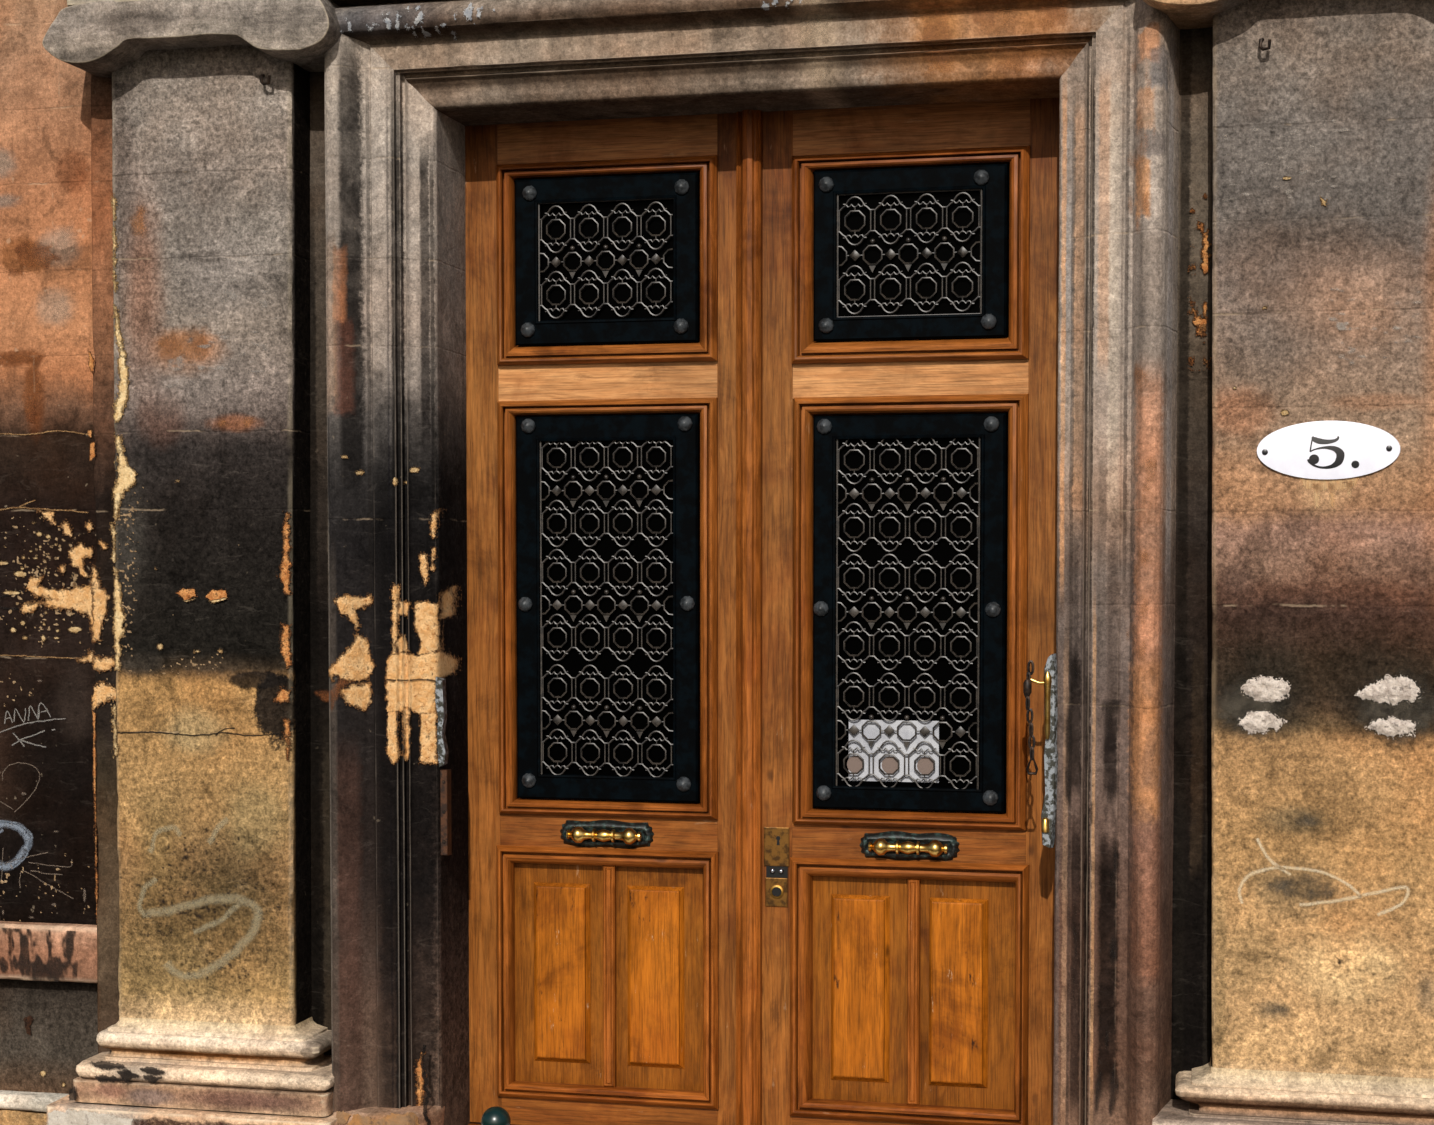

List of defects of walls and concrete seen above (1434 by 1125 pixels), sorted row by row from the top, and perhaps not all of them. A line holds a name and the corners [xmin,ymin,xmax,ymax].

spalling [0,193,157,922]
spalling [175,588,229,603]
spalling [329,508,462,765]
spalling [150,643,223,674]
water stain [1221,689,1271,731]
water stain [1366,692,1434,737]
spalling [90,1061,165,1083]